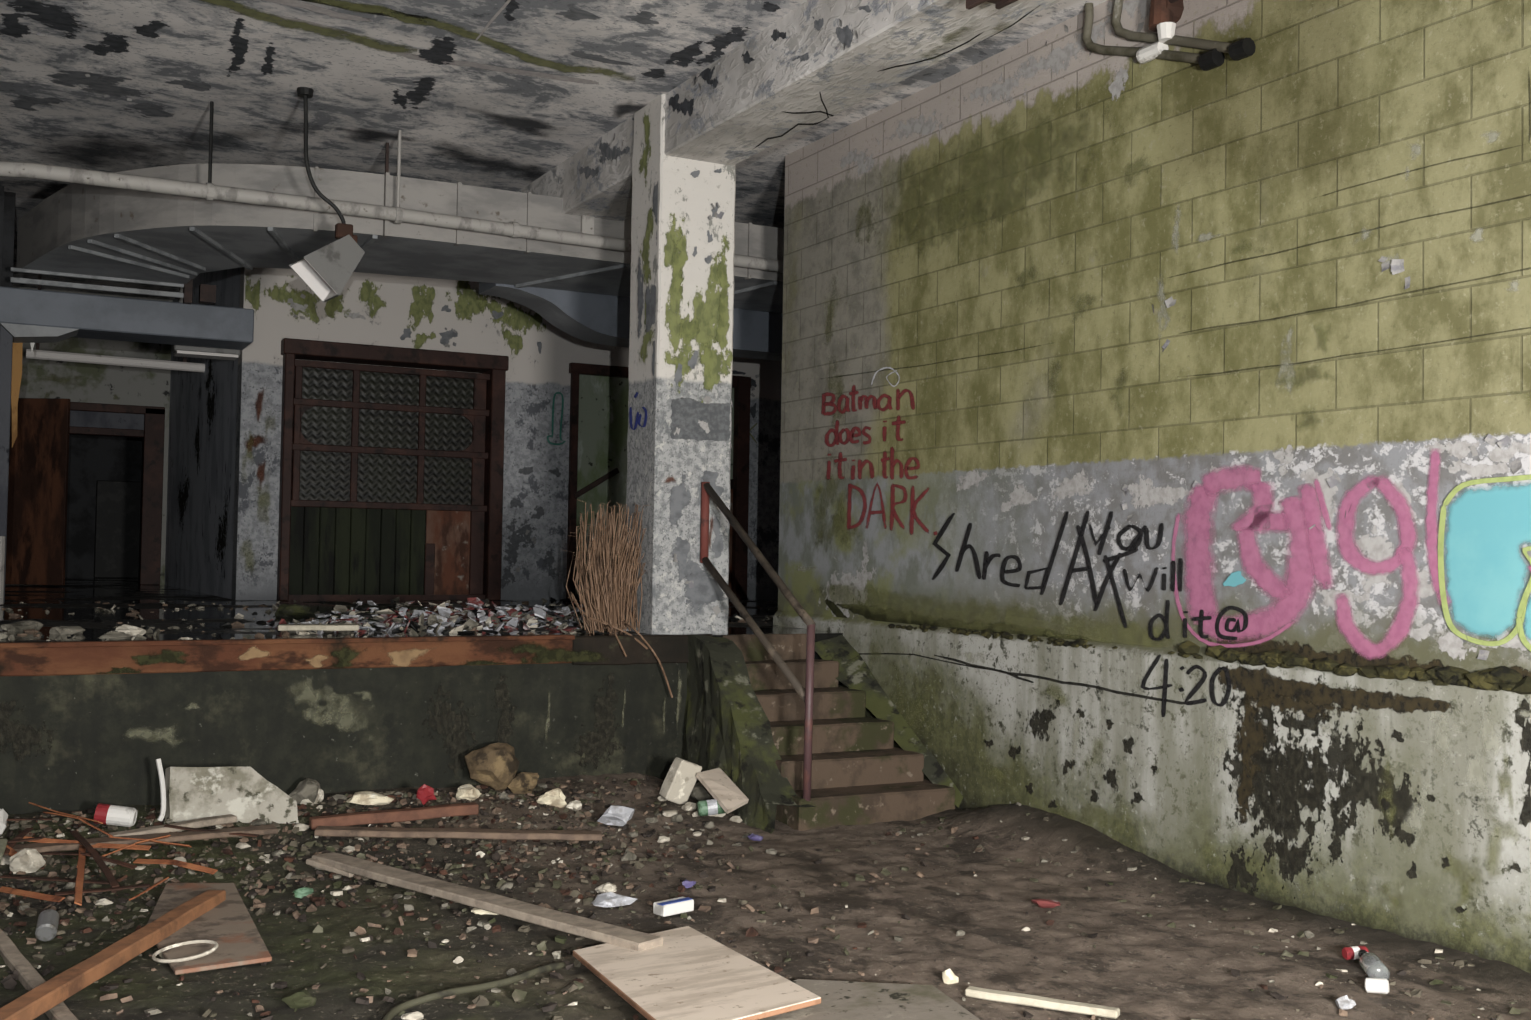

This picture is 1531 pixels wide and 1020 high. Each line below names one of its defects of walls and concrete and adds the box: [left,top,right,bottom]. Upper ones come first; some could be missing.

peeling [556,4,602,21]
peeling [625,10,659,25]
peeling [762,2,786,41]
peeling [812,17,858,50]
peeling [0,0,211,118]
peeling [572,25,754,118]
peeling [579,134,630,179]
peeling [693,202,724,264]
peeling [439,305,458,347]
crack [859,653,1185,705]
leakage [1511,666,1531,679]
leakage [1206,635,1454,899]